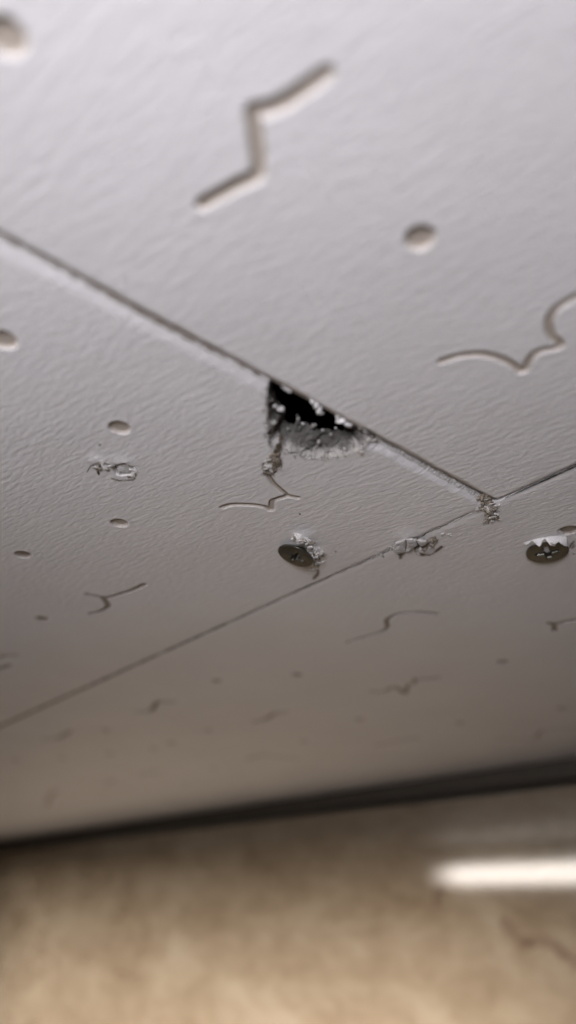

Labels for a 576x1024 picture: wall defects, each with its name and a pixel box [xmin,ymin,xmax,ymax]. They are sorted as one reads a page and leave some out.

hole [260,378,379,461]
spalling [87,461,138,482]
crack [260,431,287,499]
flaking render [475,494,503,523]
peeling [291,533,324,579]
spalling [376,533,452,559]
peeling [524,530,568,547]